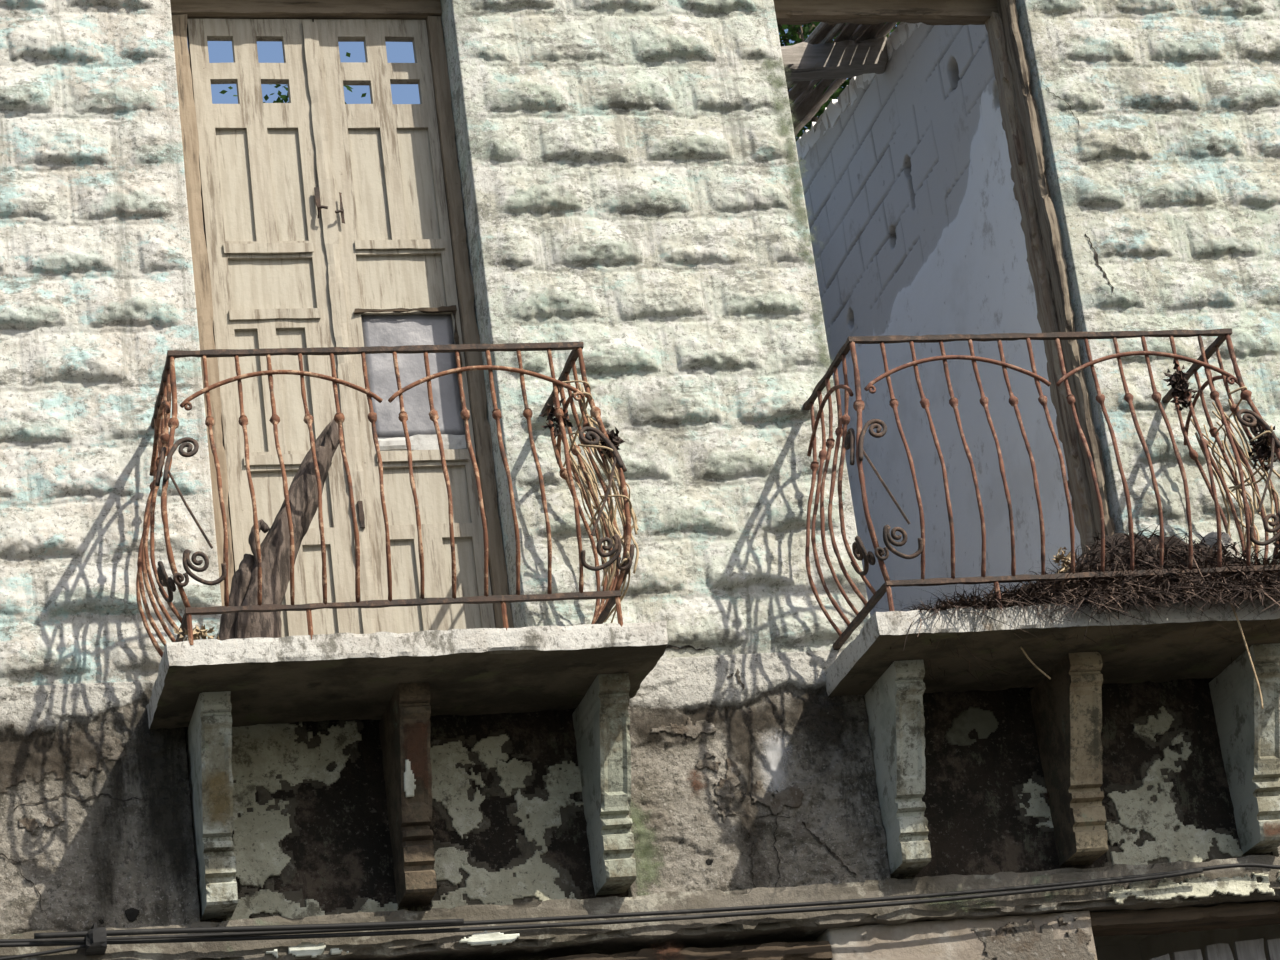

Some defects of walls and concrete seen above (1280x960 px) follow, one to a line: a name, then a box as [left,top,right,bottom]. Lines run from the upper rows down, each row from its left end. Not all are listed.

crack [1085,234,1114,293]
peeling [944,707,999,746]
peeling [221,719,408,921]
peeling [404,759,416,797]
peeling [425,729,584,911]
crack [735,731,856,888]
peeling [1012,771,1054,832]
peeling [1102,706,1280,905]
peeling [266,942,349,958]
peeling [459,931,520,946]
spalling [971,917,1095,960]